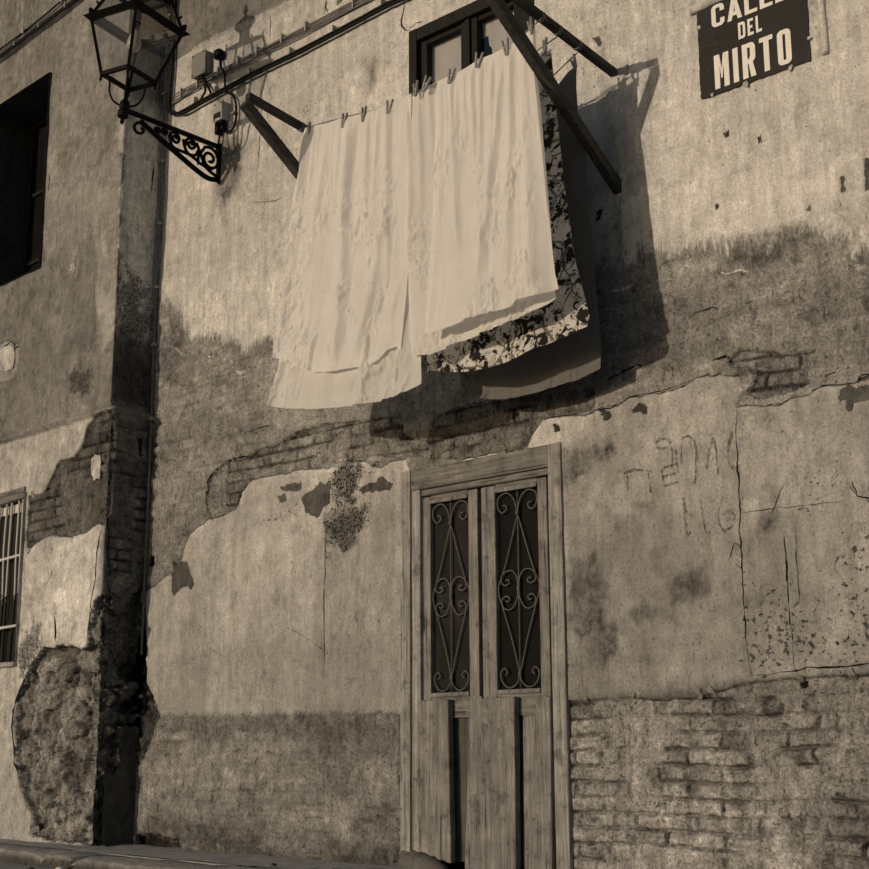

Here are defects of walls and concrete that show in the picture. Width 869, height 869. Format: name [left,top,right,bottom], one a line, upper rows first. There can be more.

spalling [0,340,19,382]
crack [606,359,642,381]
crack [817,367,869,388]
crack [545,382,687,419]
flaking render [14,222,869,869]
crack [730,405,869,676]